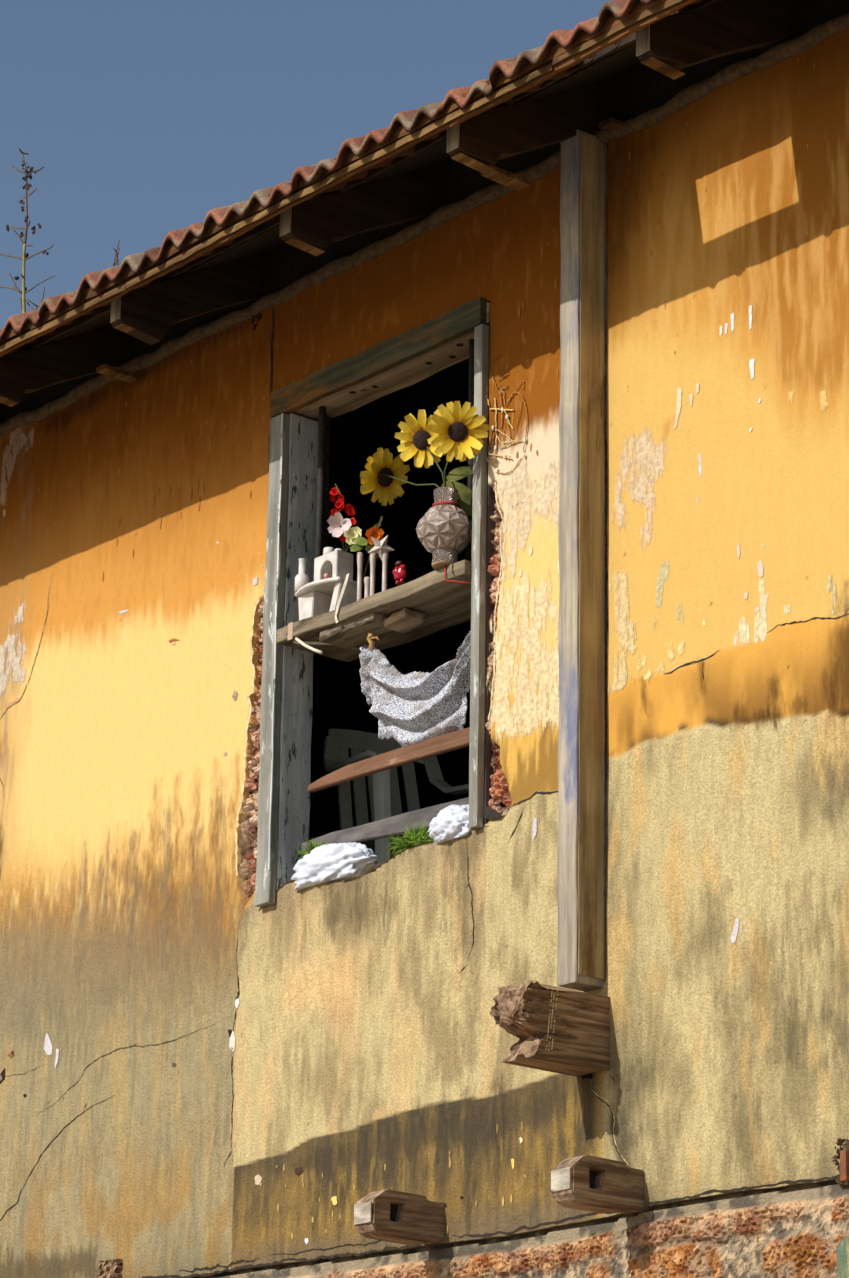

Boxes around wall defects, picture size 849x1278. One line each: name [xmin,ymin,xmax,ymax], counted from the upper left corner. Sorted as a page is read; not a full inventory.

peeling [674,383,699,433]
peeling [0,426,34,518]
peeling [612,429,667,546]
peeling [0,603,27,708]
crack [0,571,54,719]
peeling [483,459,560,820]
peeling [608,571,684,693]
crack [664,650,719,678]
crack [767,608,849,633]
flaking render [232,565,264,902]
damp [44,1033,59,1068]
crack [0,922,239,1220]